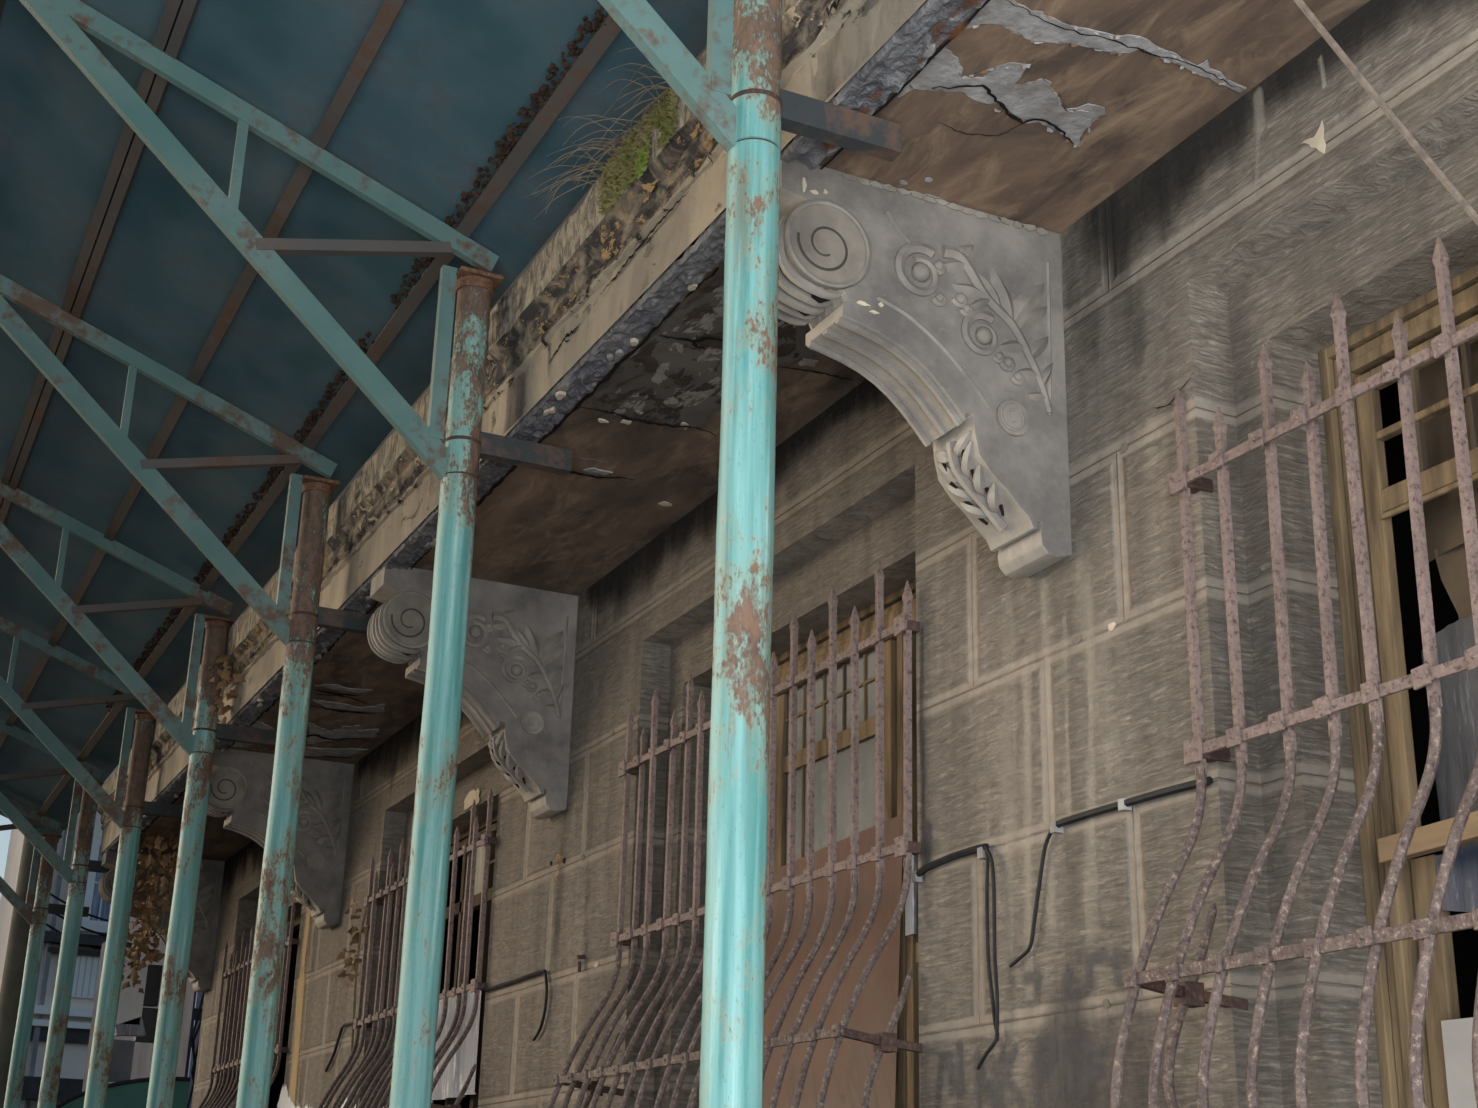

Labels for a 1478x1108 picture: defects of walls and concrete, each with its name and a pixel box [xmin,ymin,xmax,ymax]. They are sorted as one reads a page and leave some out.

peeling [782,0,878,57]
flaking render [828,0,1247,148]
spalling [780,135,1048,236]
spalling [476,459,517,507]
spalling [323,453,439,614]
spalling [314,627,346,665]
spalling [215,665,284,752]
flaking render [304,684,385,758]